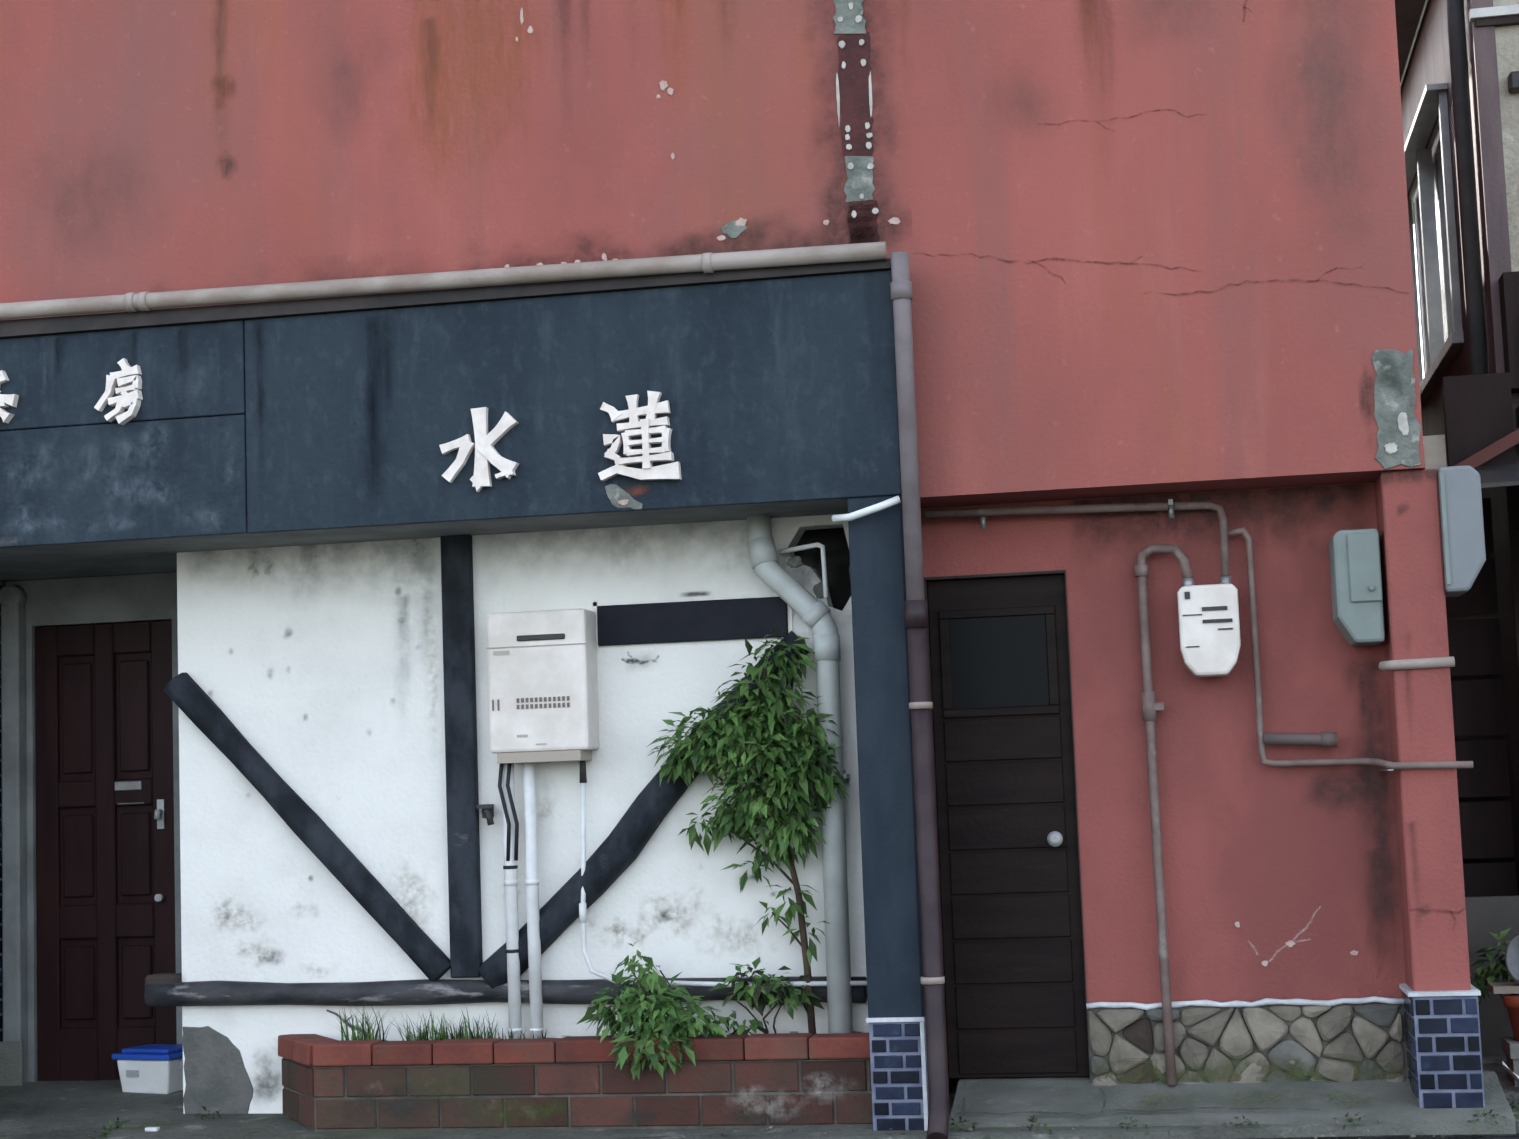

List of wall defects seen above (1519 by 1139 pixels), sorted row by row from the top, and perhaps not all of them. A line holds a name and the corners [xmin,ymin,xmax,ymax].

spalling [1362,348,1421,470]
flaking render [182,1026,275,1114]